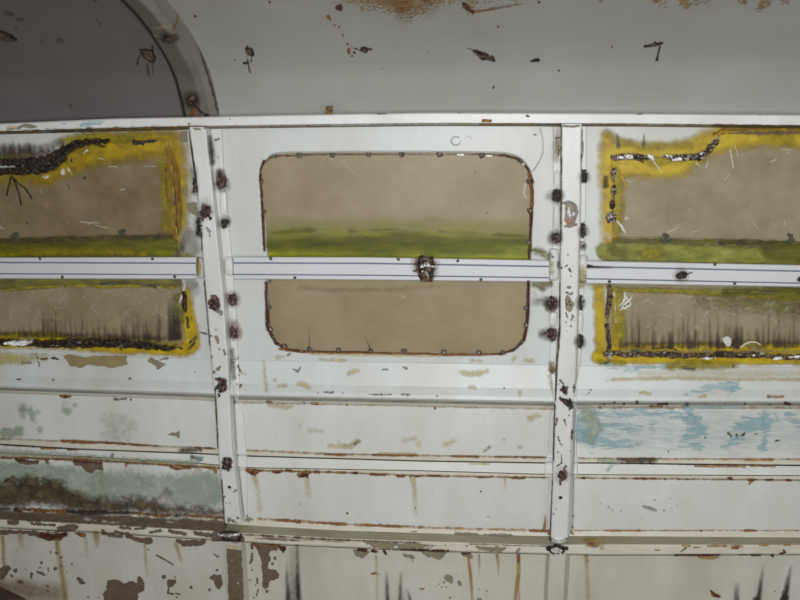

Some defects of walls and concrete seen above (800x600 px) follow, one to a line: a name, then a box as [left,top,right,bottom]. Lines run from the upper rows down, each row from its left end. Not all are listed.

corrosion [326,0,518,57]
peeling [21,353,127,368]
corrosion [0,438,220,474]
leakage [0,451,221,506]
corrosion [245,468,546,492]
peeling [0,507,253,551]
corrosion [257,518,550,535]
peeling [353,542,449,562]
peeling [461,545,505,559]
peeling [0,551,73,592]
peeling [87,576,145,600]
peeling [208,543,286,600]